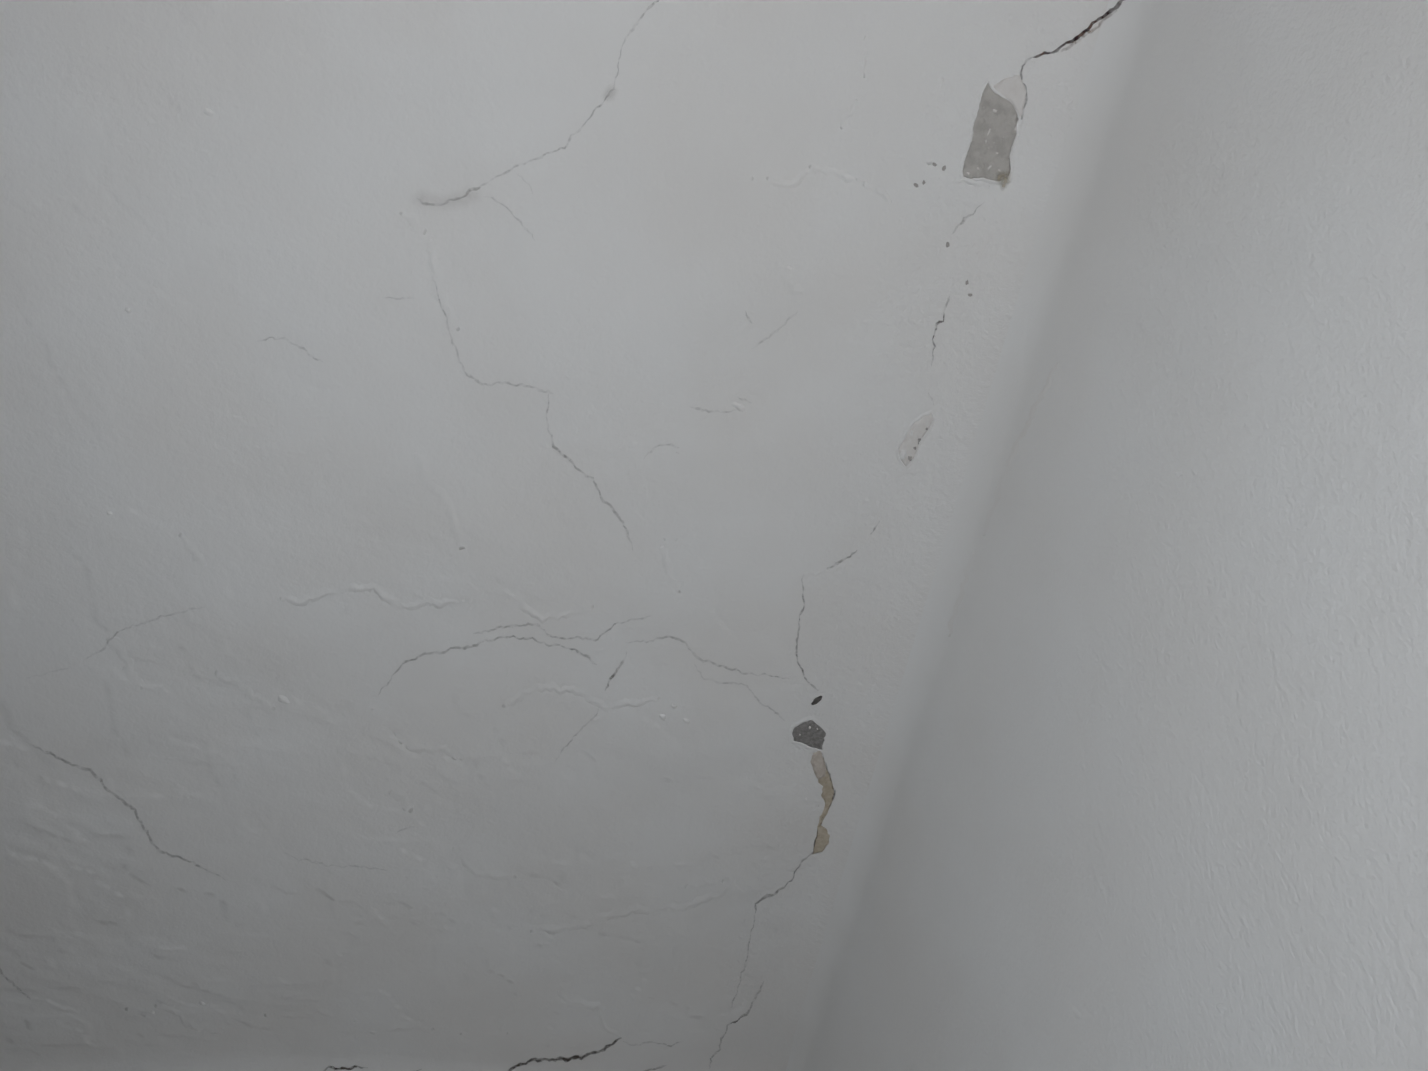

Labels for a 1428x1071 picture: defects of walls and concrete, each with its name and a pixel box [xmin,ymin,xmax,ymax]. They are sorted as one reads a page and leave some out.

crack [1034,0,1123,58]
flaking render [914,68,1027,188]
flaking render [784,693,835,854]
crack [509,1040,617,1070]